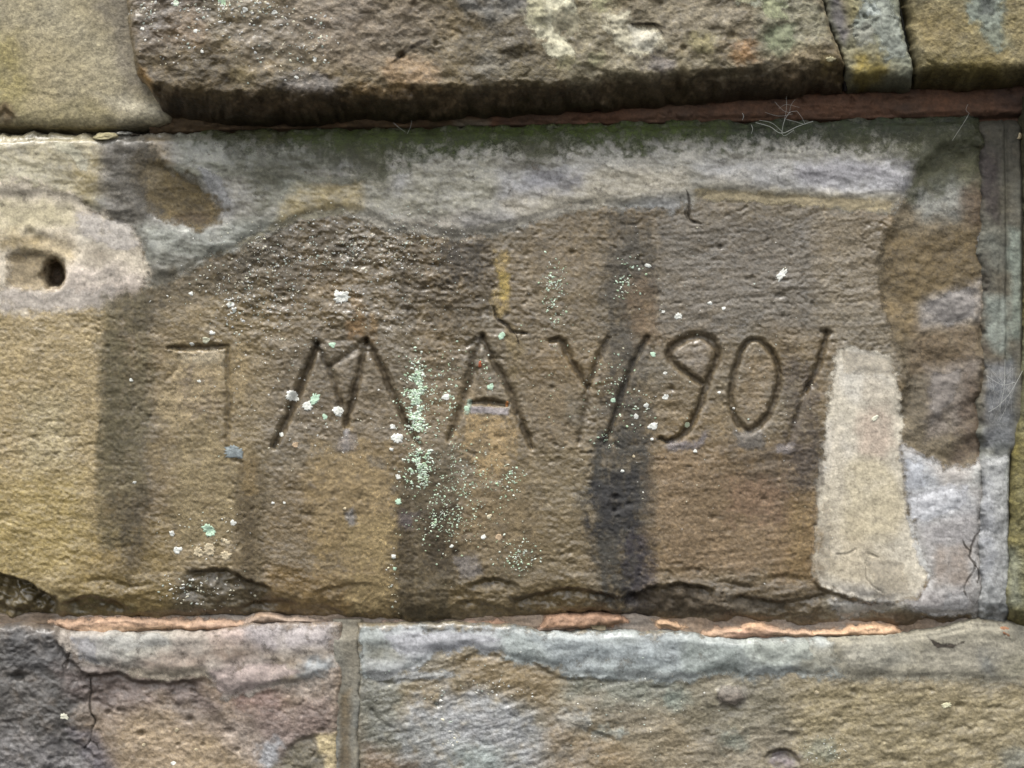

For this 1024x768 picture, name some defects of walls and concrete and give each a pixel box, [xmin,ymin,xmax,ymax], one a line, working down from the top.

water stain [587,217,656,608]